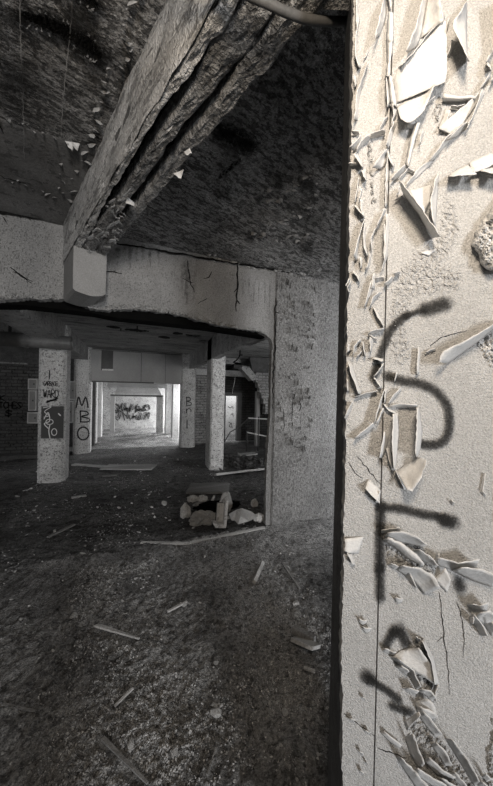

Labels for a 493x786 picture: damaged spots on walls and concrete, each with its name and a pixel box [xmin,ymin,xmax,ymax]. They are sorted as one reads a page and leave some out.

spalling [11,0,138,165]
spalling [213,122,260,179]
crack [116,243,300,312]
peeling [207,254,317,349]
peeling [251,175,319,247]
peeling [344,0,493,492]
spalling [266,350,313,522]
peeling [365,479,381,503]
crack [437,593,465,694]
flaking render [381,636,493,786]